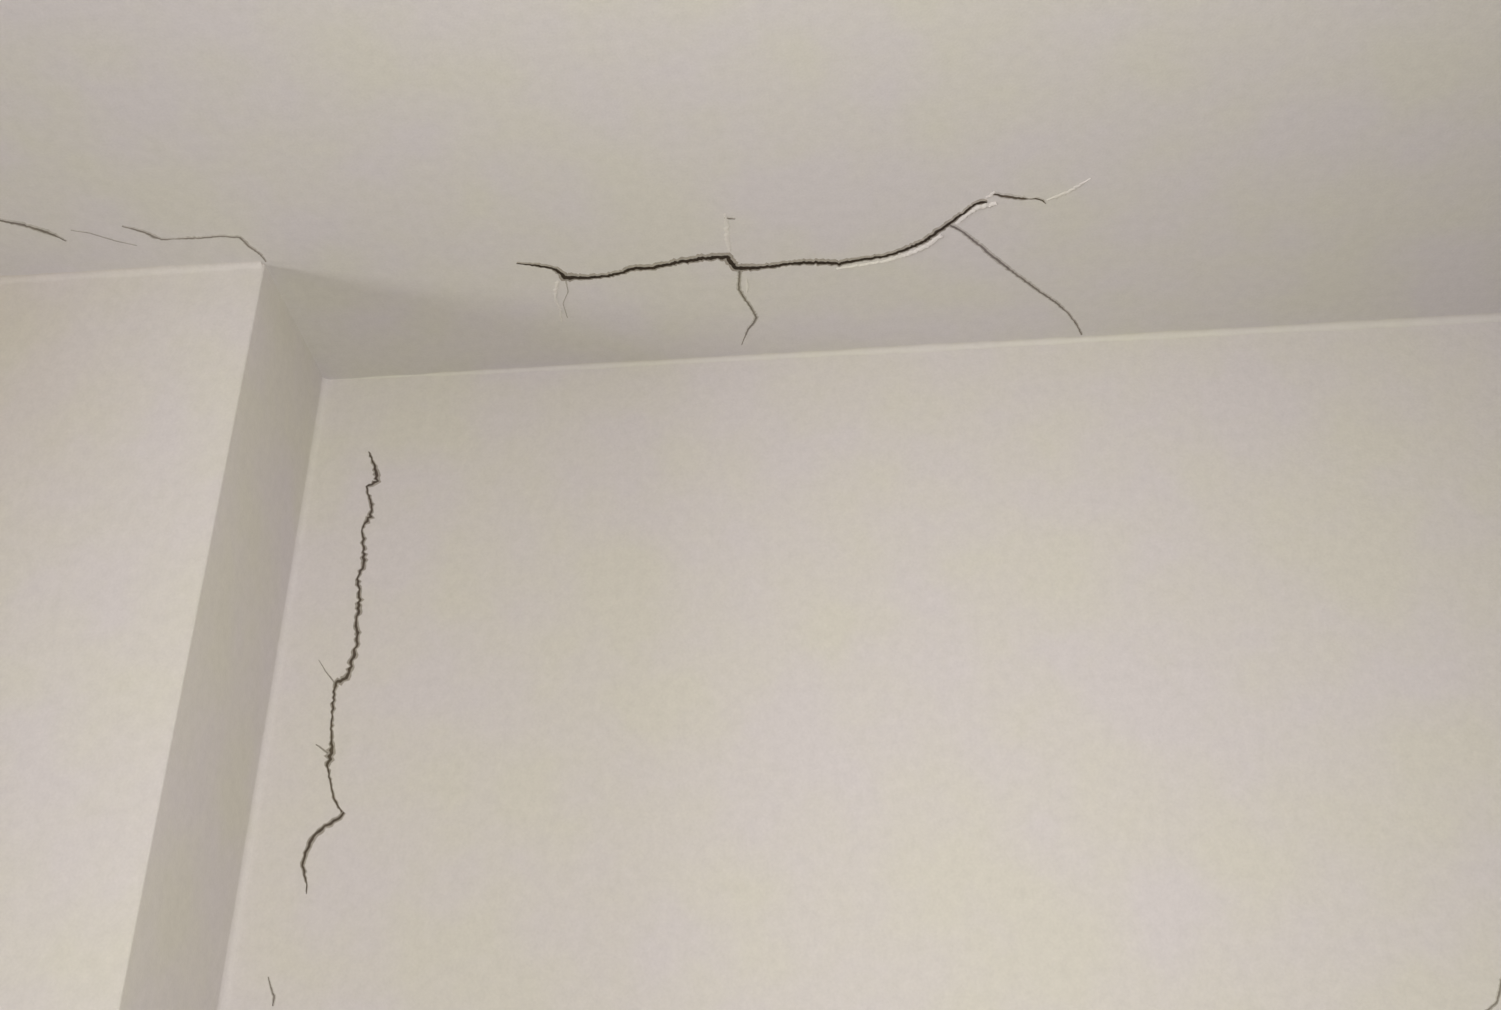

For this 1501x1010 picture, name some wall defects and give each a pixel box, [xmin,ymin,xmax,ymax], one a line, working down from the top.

crack [0,218,267,262]
crack [516,177,1091,345]
crack [300,452,381,894]
crack [1485,977,1501,1010]